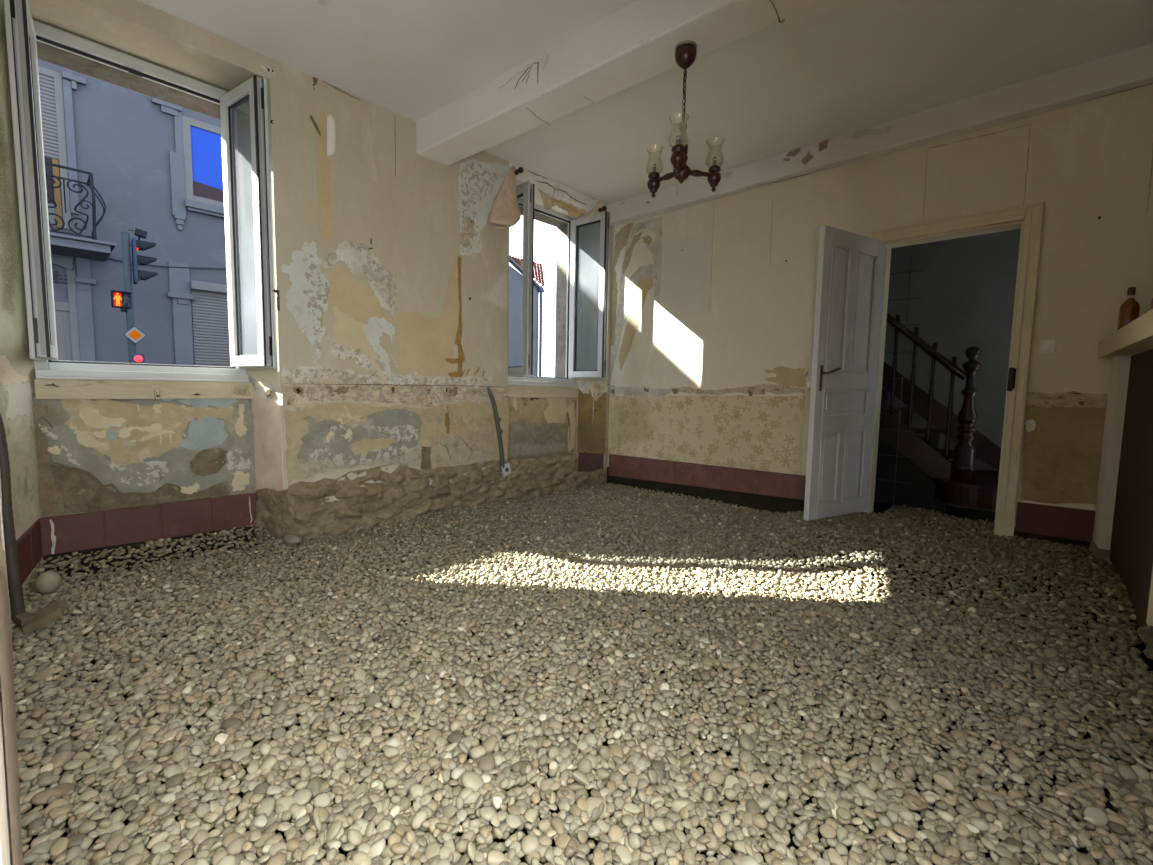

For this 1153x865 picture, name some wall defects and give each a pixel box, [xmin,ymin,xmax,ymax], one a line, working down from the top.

peeling [783,139,829,164]
spalling [0,107,510,540]
peeling [577,217,662,401]
peeling [748,366,806,396]
spalling [1137,625,1153,660]